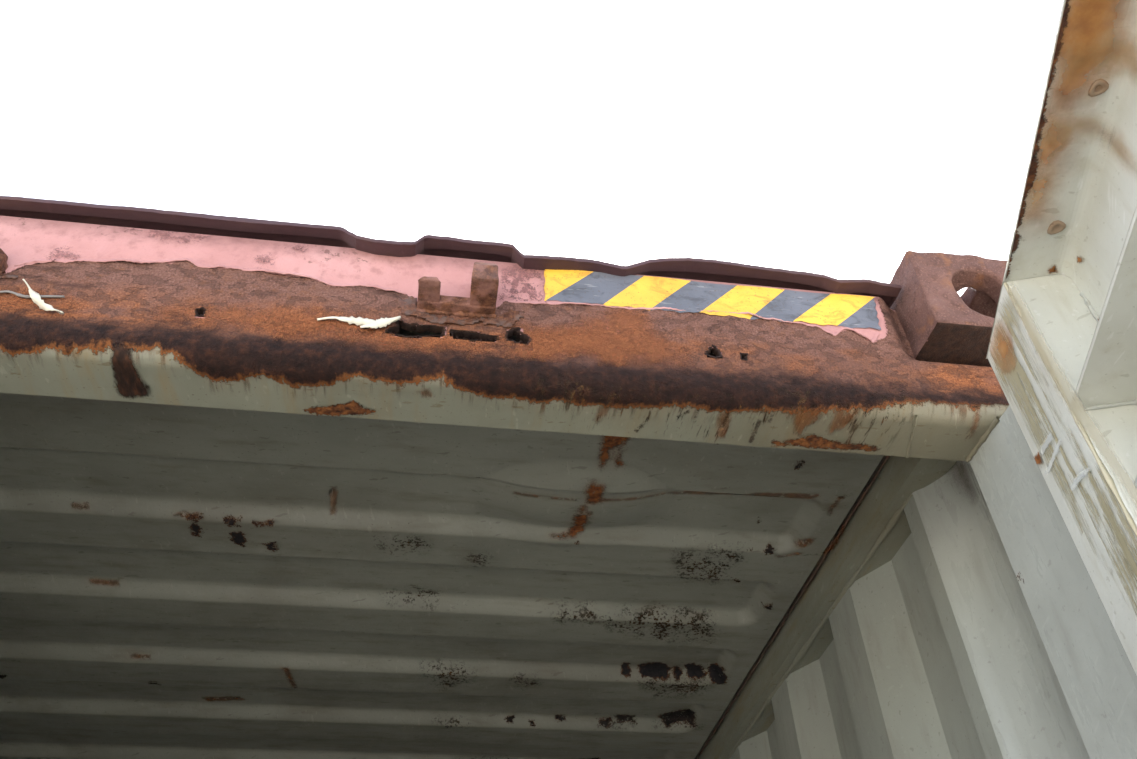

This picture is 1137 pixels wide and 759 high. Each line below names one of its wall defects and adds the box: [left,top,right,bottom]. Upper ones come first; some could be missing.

rust [1006,0,1122,278]
rust [0,261,1011,467]
rust [552,483,819,539]